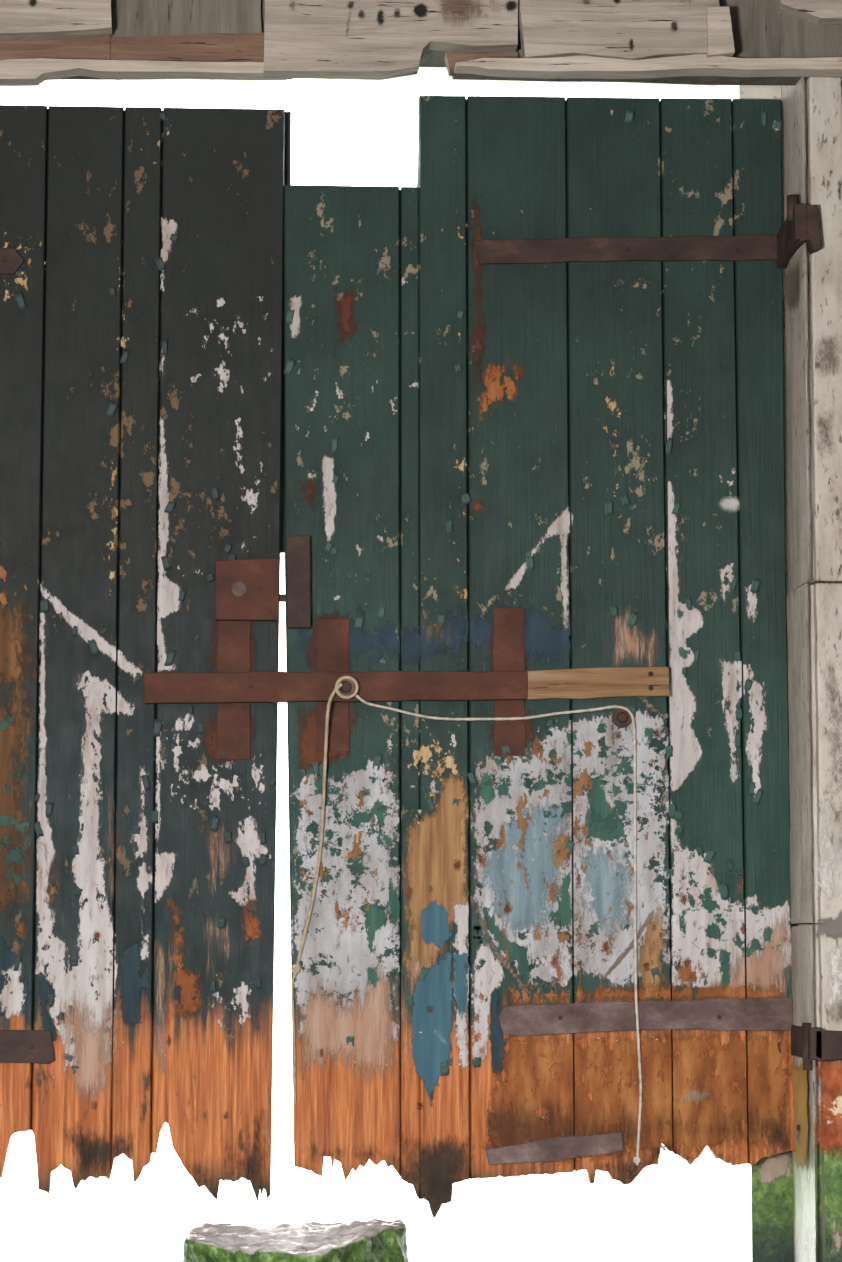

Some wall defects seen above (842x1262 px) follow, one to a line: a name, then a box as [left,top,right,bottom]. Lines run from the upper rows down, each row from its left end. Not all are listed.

rust [791,1060,842,1169]